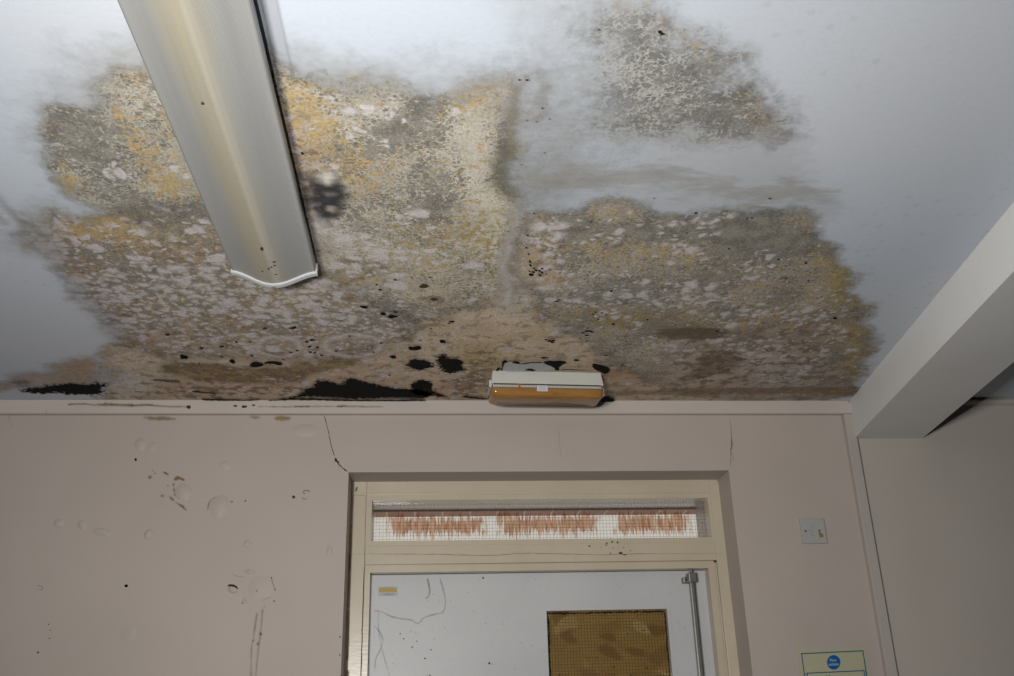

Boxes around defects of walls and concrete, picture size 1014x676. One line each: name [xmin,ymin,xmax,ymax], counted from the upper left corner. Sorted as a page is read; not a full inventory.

mould [598,12,785,141]
damp [0,53,877,409]
crack [324,416,347,471]
crack [407,550,725,558]
crack [358,567,366,676]